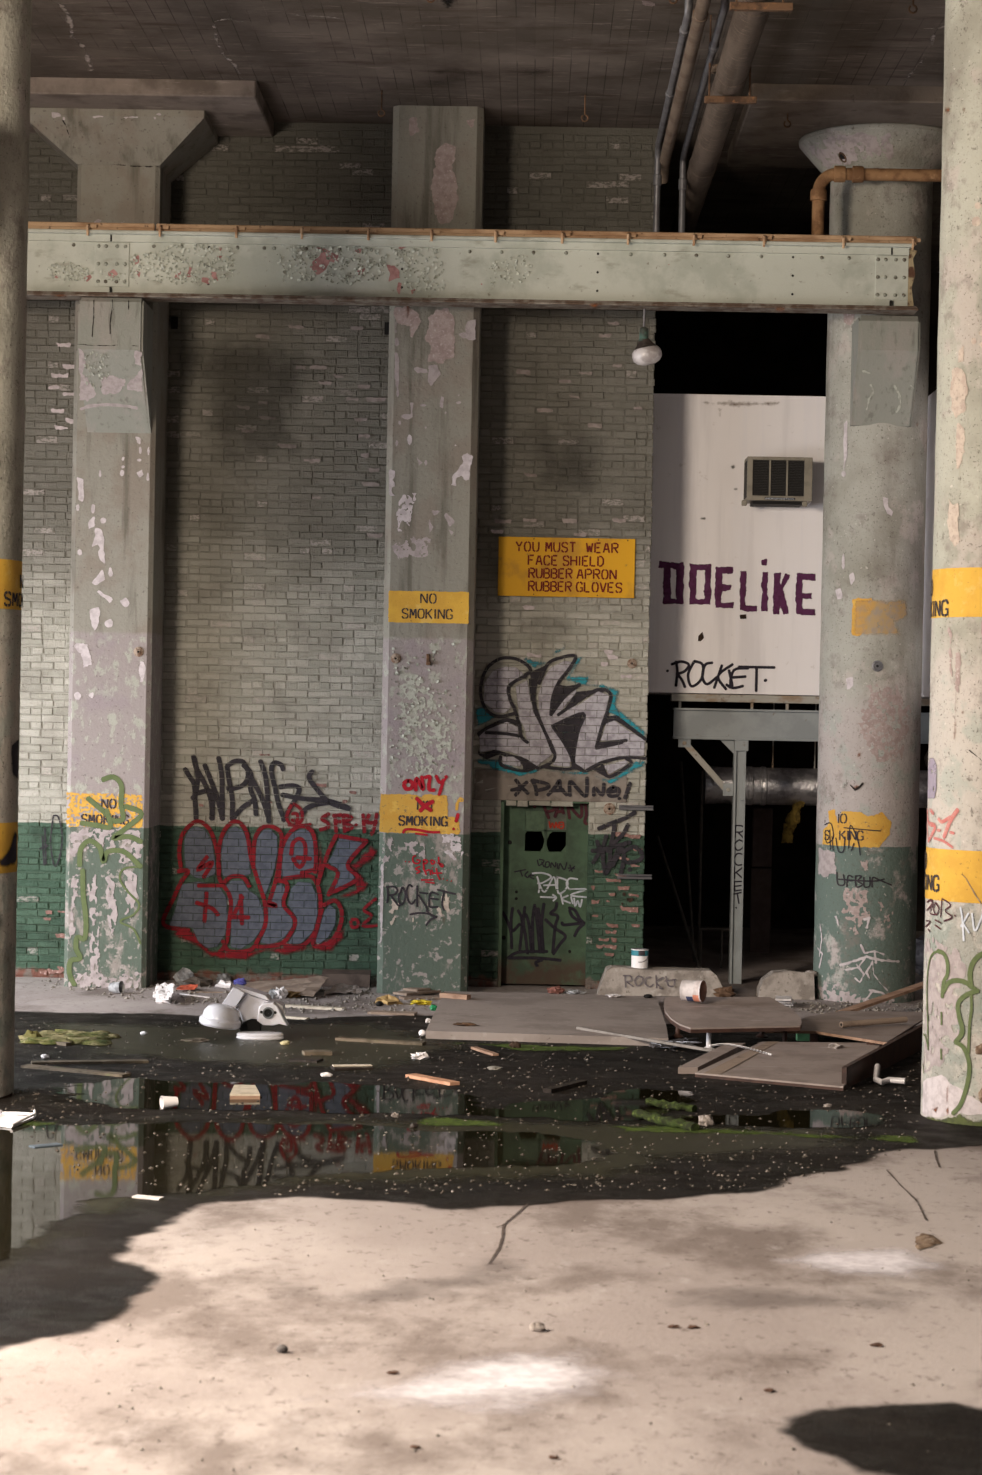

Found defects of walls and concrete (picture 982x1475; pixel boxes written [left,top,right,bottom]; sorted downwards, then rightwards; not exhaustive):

peeling [47,243,236,286]
peeling [120,437,150,481]
peeling [277,245,476,559]
peeling [74,470,129,667]
peeling [39,828,143,988]
leakage [0,1011,982,1347]
crack [489,1203,529,1264]
leakage [783,1402,982,1475]